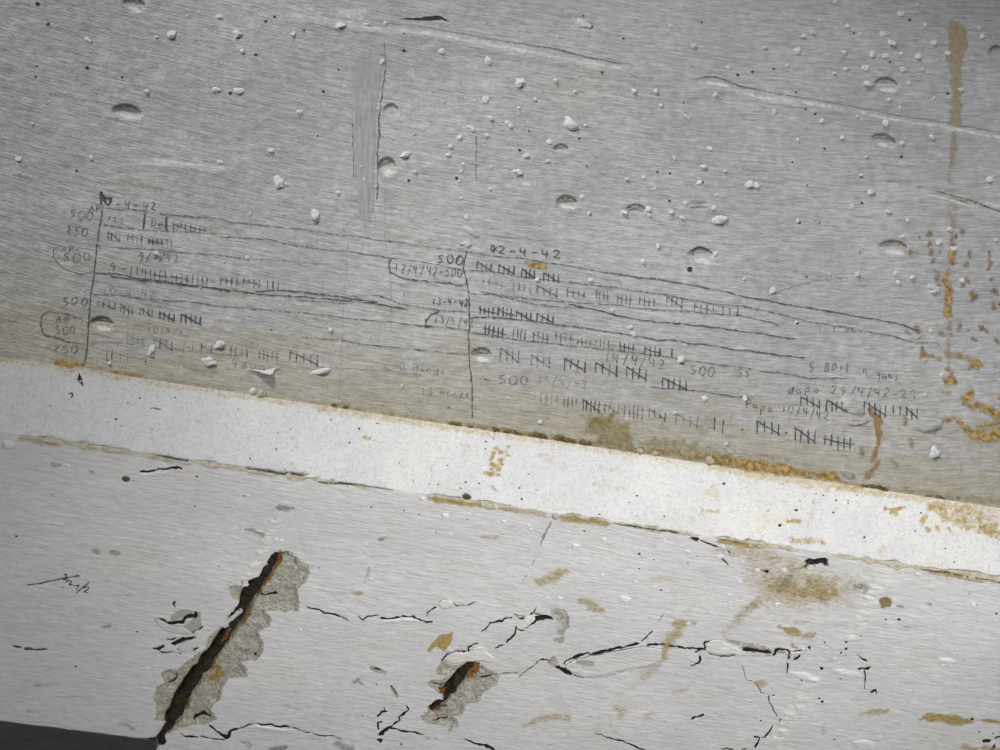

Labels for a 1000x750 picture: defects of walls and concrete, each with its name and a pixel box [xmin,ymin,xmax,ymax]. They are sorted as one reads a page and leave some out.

rust [905,229,1000,395]
rust [942,390,1000,442]
spalling [153,551,311,745]
crack [180,723,342,740]
crack [306,601,476,624]
crack [377,705,424,743]
spalling [421,646,500,732]
crack [465,739,495,750]
crack [441,607,554,661]
crack [502,615,709,678]
crack [722,666,781,750]
crack [840,641,877,694]